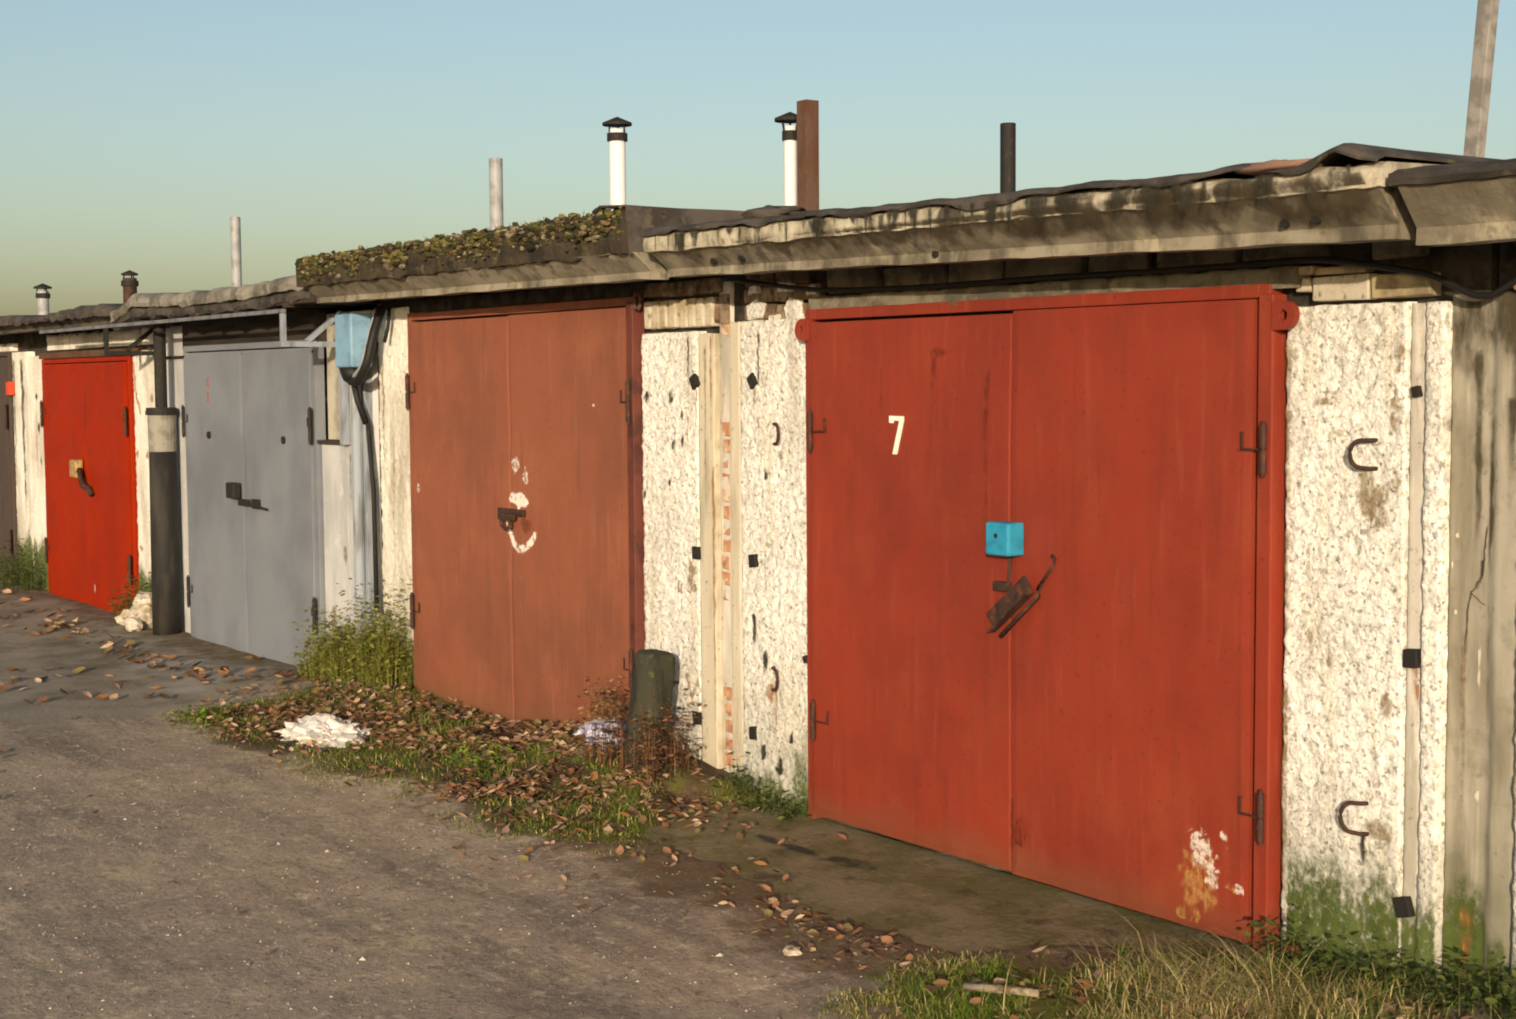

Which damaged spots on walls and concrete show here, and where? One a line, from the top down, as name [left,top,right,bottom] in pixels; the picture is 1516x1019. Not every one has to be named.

water stain [652,229,698,257]
water stain [726,165,1371,253]
water stain [1454,292,1516,547]
crack [1464,528,1488,653]
water stain [1461,646,1481,684]
peeling [1177,832,1244,922]
water stain [1289,880,1341,949]
water stain [1365,905,1397,970]